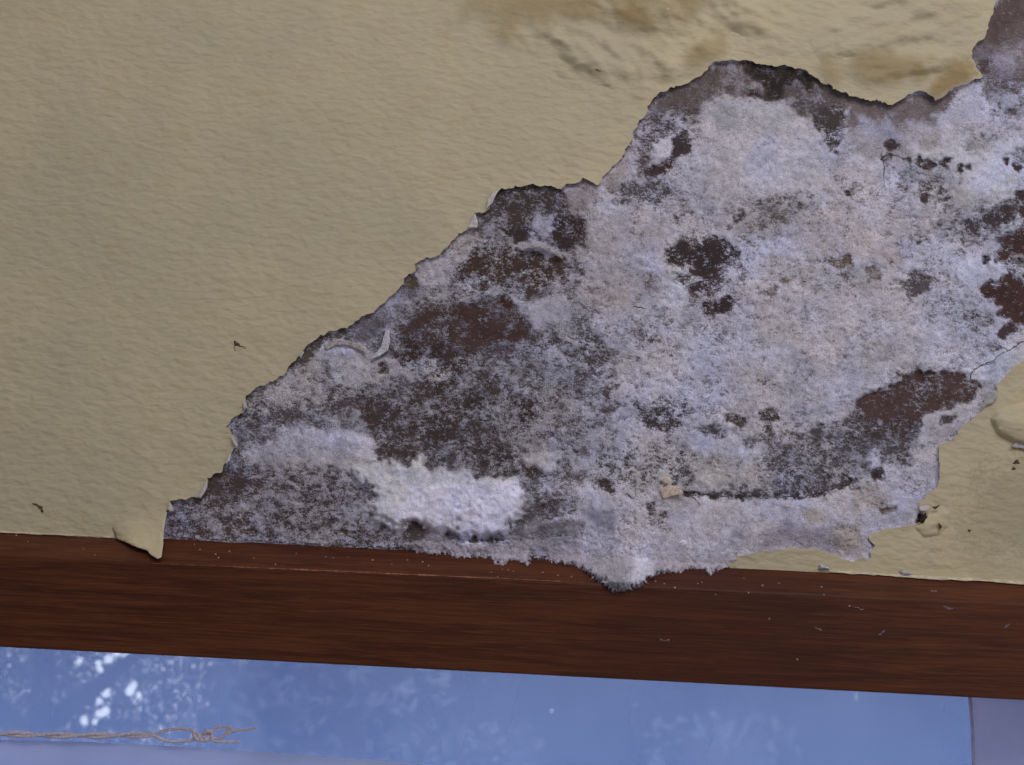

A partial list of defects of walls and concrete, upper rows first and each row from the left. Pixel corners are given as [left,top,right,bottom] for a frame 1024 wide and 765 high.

peeling [972,0,1024,90]
peeling [856,96,951,122]
peeling [619,118,692,206]
peeling [880,140,971,204]
peeling [1003,151,1024,174]
peeling [237,239,576,476]
water stain [164,33,1024,593]
peeling [667,214,743,314]
peeling [964,190,1024,340]
peeling [642,404,683,431]
peeling [704,371,998,501]
peeling [112,437,425,559]